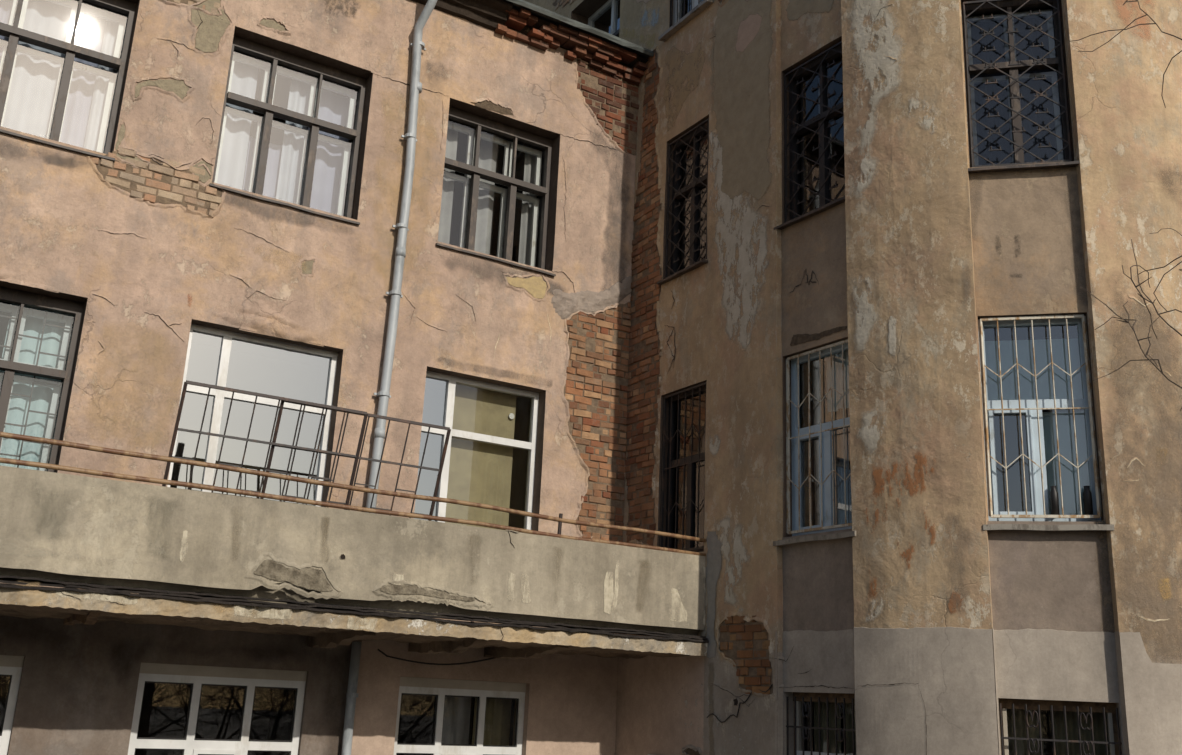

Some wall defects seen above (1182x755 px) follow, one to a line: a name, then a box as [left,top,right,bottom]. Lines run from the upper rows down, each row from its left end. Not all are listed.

peeling [158,0,234,57]
peeling [851,0,902,195]
spalling [86,120,227,219]
spalling [494,0,664,546]
peeling [709,132,768,348]
peeling [56,590,137,604]
peeling [234,605,292,619]
spalling [244,552,343,599]
peeling [347,617,377,630]
spalling [371,578,494,612]
spalling [716,518,776,699]
crack [780,671,927,755]